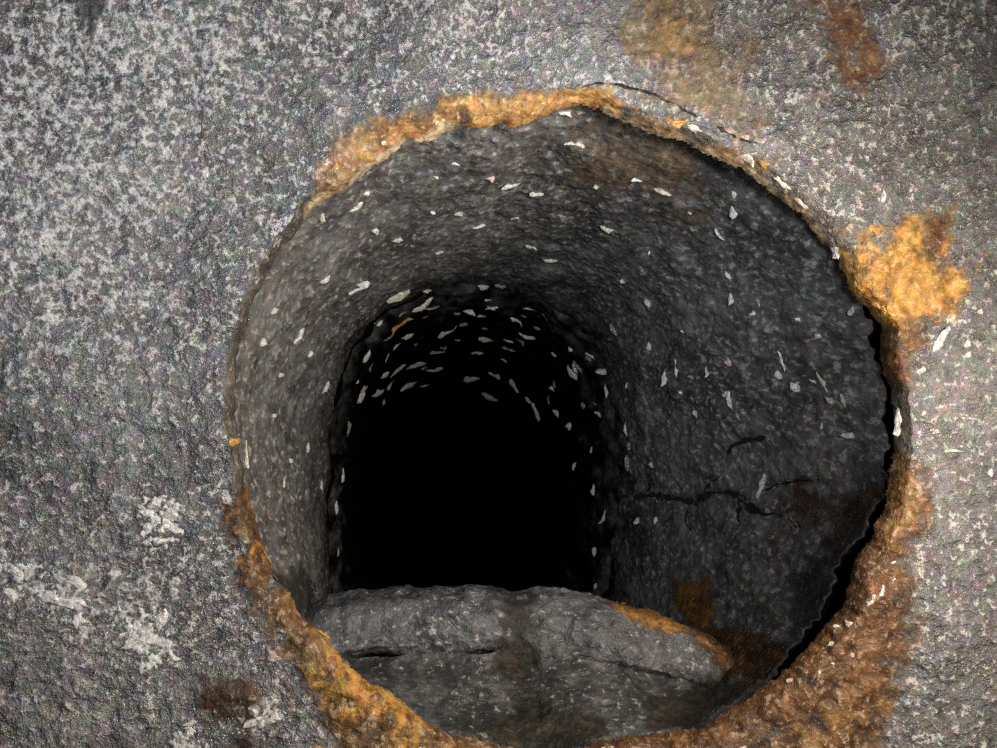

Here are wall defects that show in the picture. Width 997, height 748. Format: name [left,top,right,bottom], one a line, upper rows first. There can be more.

corrosion [809,0,887,93]
crack [585,82,766,144]
corrosion [838,214,970,390]
crack [611,435,814,534]
corrosion [218,485,514,748]
corrosion [585,450,934,748]
corrosion [199,674,263,748]